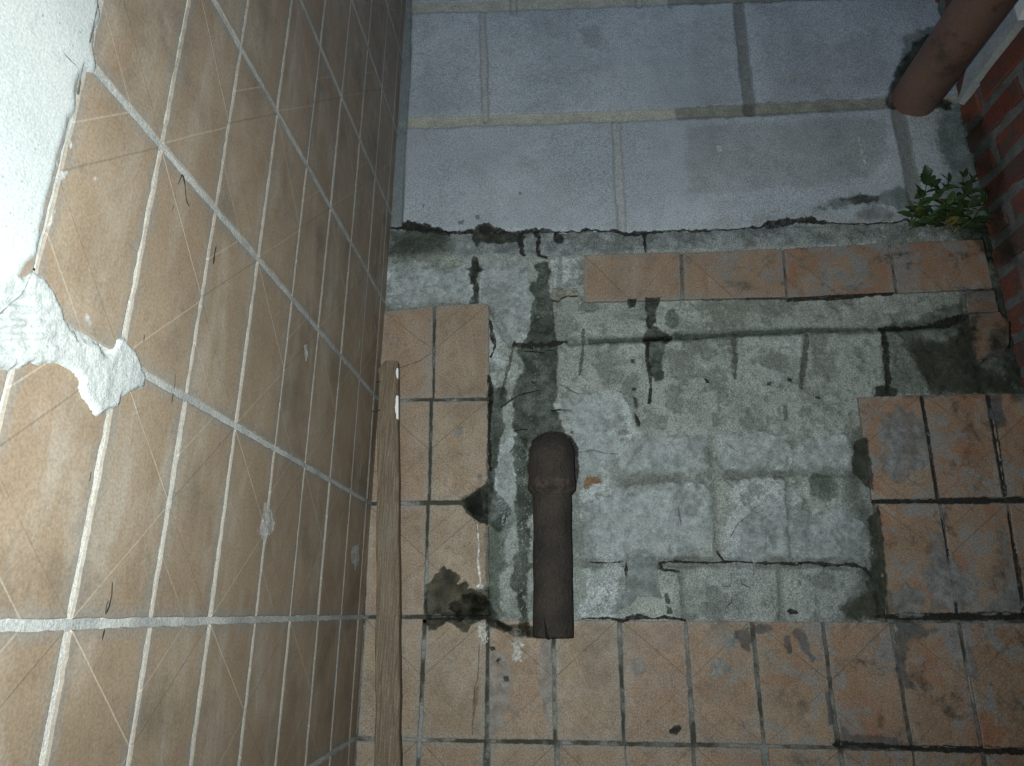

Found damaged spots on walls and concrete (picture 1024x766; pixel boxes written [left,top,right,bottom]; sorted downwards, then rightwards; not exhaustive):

crack [390,216,910,259]
damp [628,298,673,404]
damp [425,257,564,662]
flaking render [385,219,1024,623]
crack [657,510,871,611]
crack [581,614,687,623]